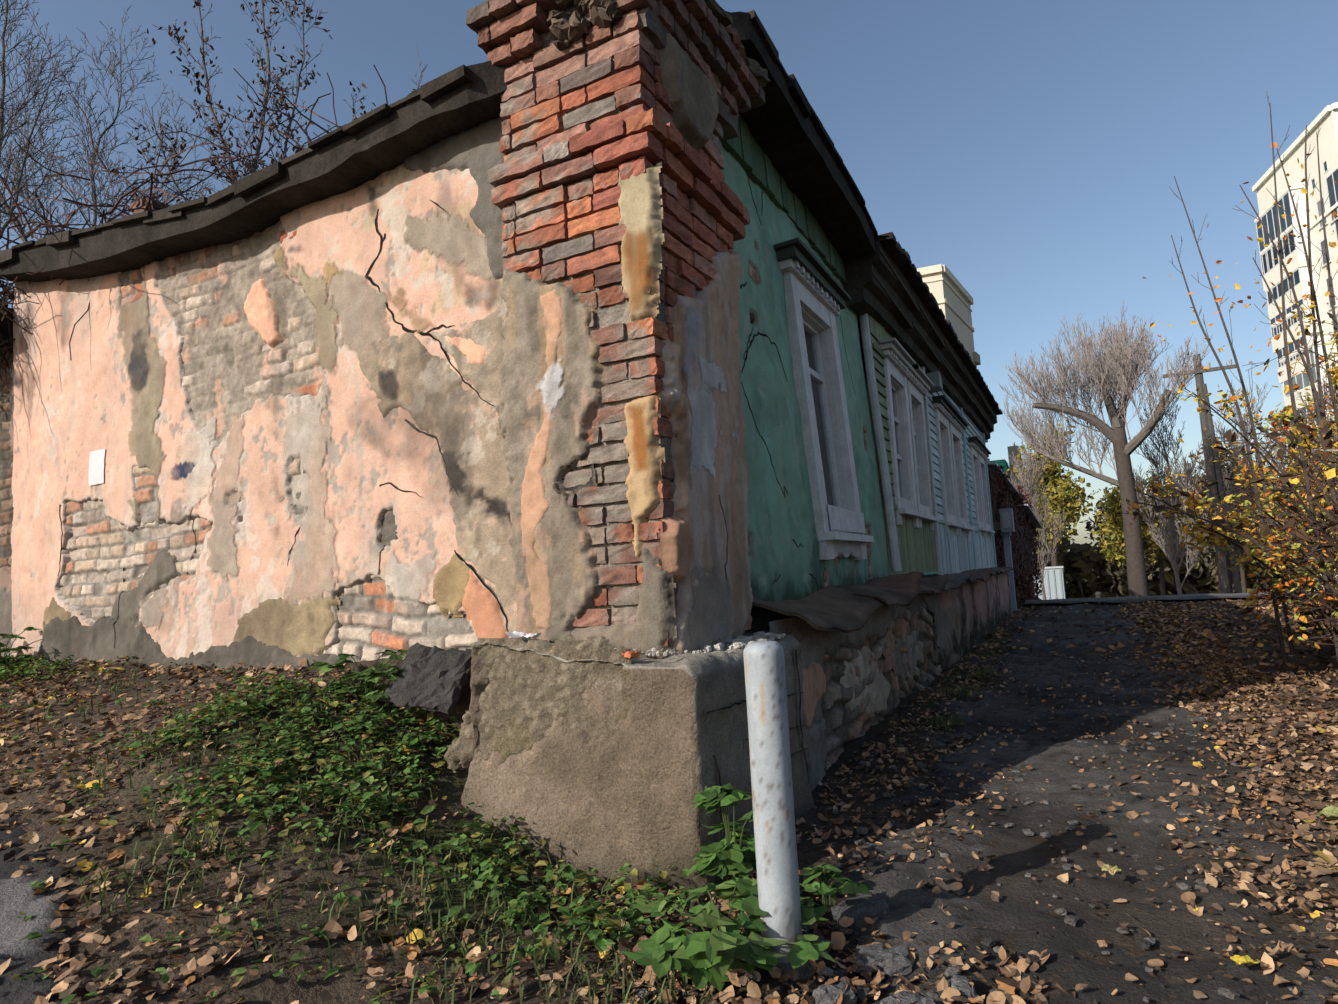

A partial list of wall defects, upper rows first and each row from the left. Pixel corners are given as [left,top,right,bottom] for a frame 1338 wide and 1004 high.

crack [379,482,421,497]
flaking render [59,0,770,773]
crack [365,209,495,406]
crack [404,419,459,497]
crack [740,328,788,498]